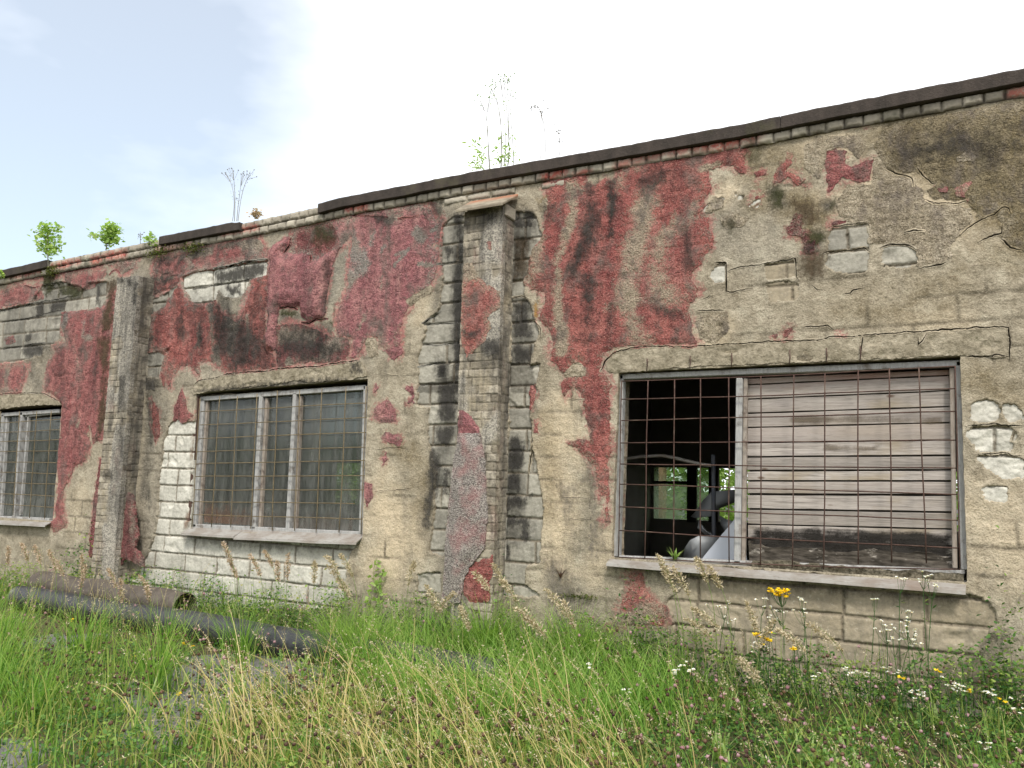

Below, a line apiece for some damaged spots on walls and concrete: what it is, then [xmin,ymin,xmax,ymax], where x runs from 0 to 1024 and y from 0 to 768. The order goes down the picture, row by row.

crack [885,166,1023,252]
leakage [424,212,532,528]
peeling [121,102,1024,609]
crack [599,323,1013,373]
leakage [506,437,533,560]